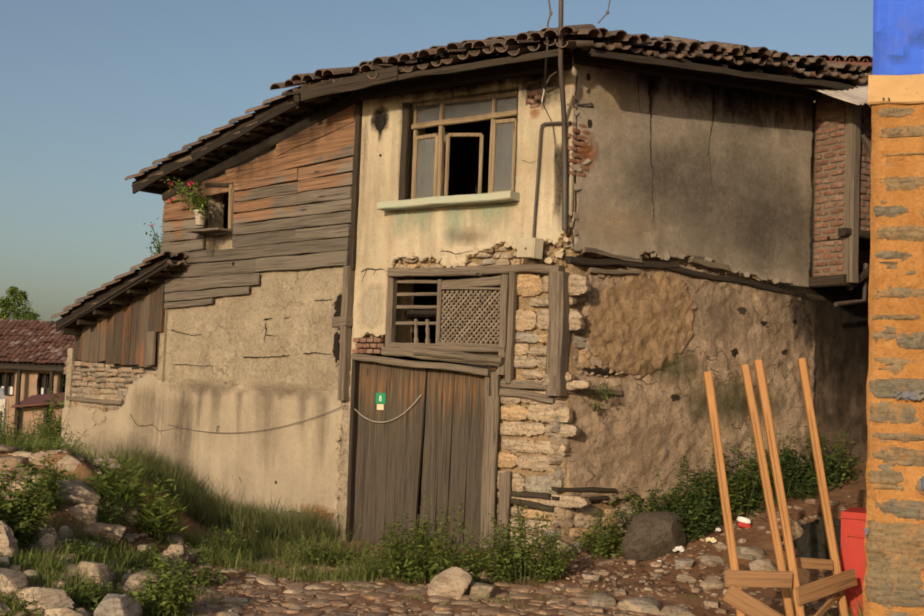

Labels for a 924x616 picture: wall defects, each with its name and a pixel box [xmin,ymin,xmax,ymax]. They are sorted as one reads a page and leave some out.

crack [638,77,655,224]
flaking render [543,184,601,266]
flaking render [384,242,518,271]
flaking render [585,253,790,286]
spalling [331,291,342,317]
spalling [332,328,340,366]
flaking render [308,371,352,541]